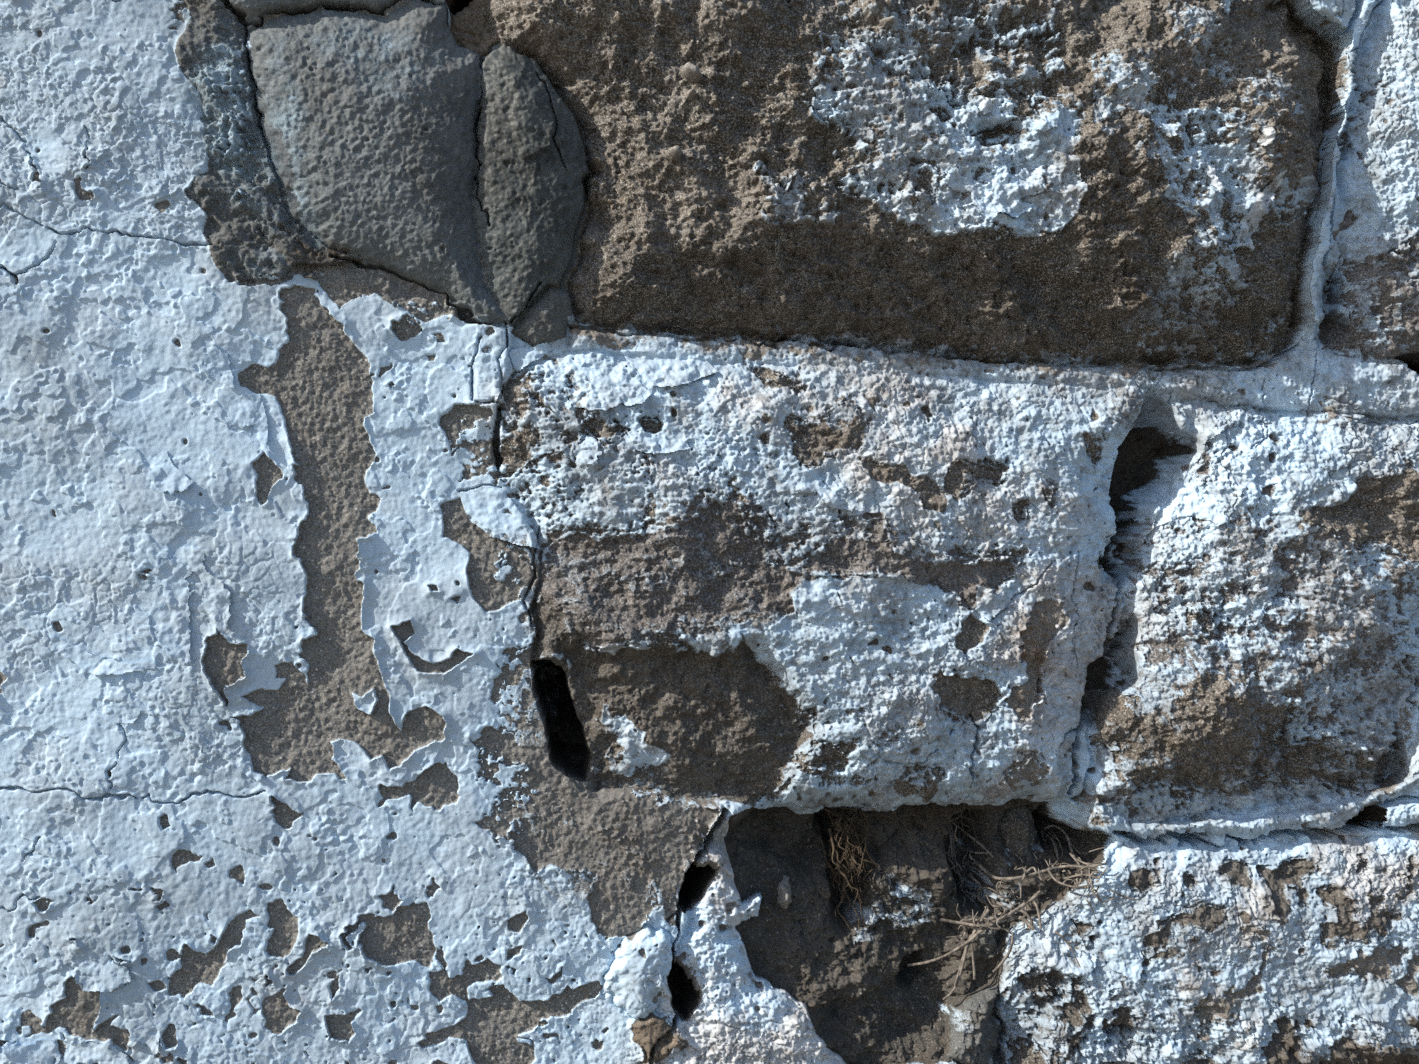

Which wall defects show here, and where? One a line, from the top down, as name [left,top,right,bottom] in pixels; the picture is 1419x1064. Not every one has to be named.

crack [0,118,209,284]
crack [474,40,501,227]
peeling [810,0,1319,250]
peeling [47,285,460,812]
crack [522,526,541,628]
peeling [428,329,1025,941]
spalling [1080,667,1412,796]
crack [692,805,735,867]
peeling [148,878,604,1064]
crack [649,1005,681,1064]
crack [666,903,682,963]
peeling [1016,853,1419,1064]